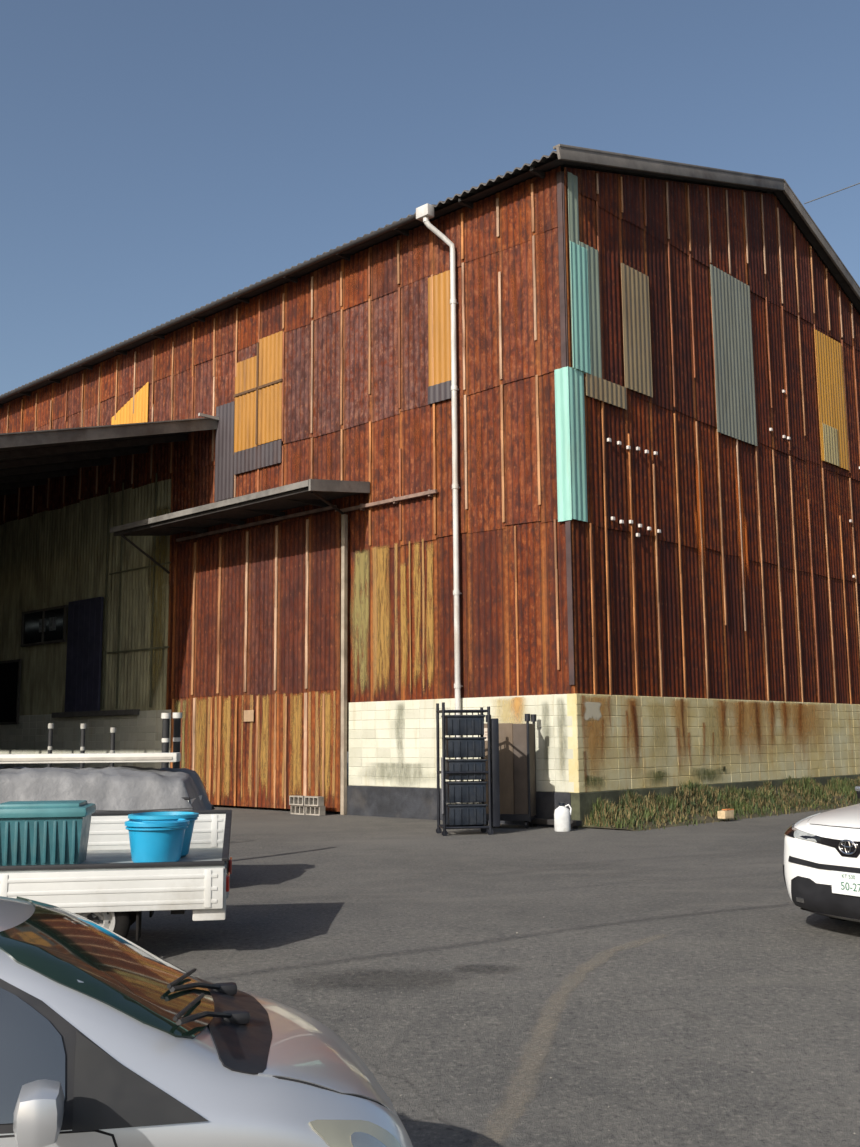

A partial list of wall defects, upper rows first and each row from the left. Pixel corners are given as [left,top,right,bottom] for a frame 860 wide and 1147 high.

rust [695,462,705,558]
rust [736,475,749,577]
rust [582,696,610,784]
rust [626,698,638,748]
rust [675,699,690,754]
rust [703,701,803,745]